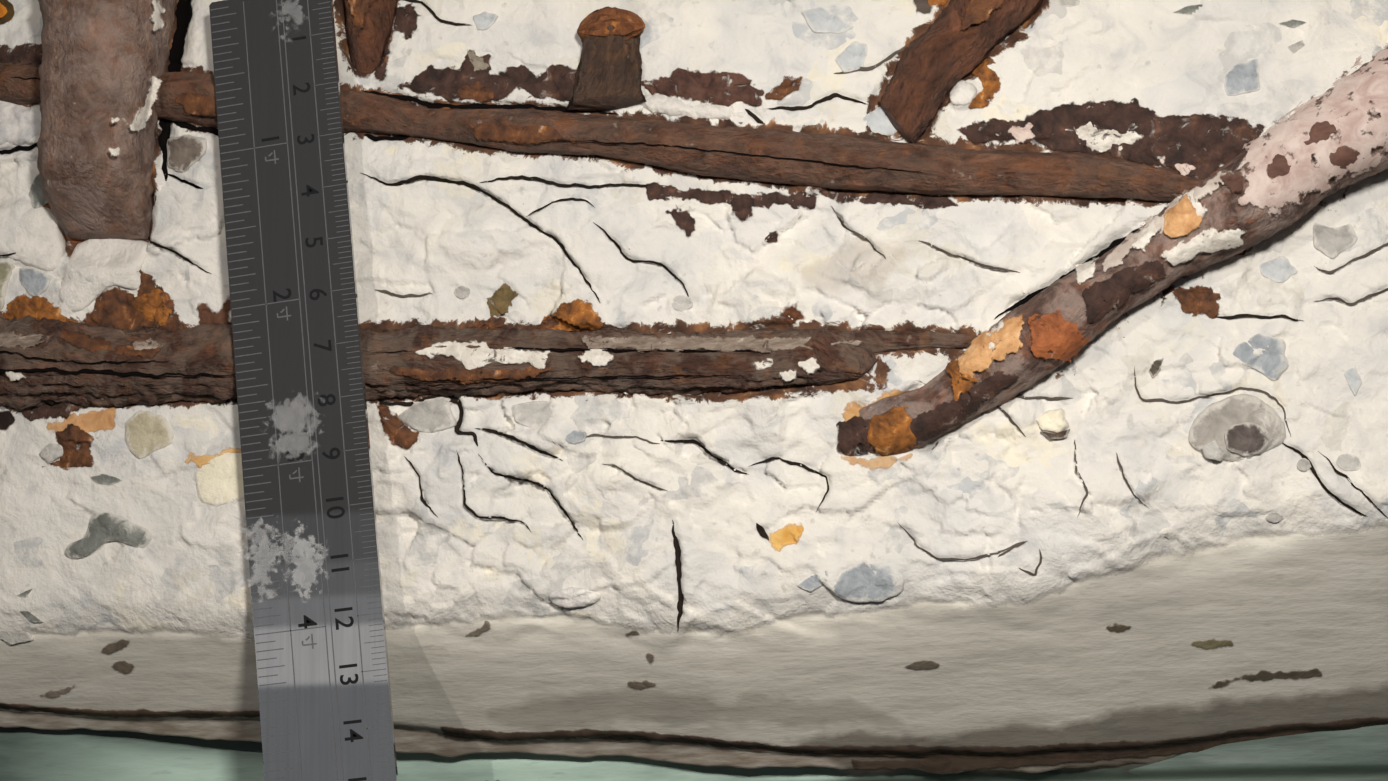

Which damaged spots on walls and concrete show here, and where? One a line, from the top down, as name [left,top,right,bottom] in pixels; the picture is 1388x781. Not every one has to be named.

corrosion [374,4,577,103]
crack [362,90,619,115]
corrosion [641,68,803,107]
spalling [333,0,1388,174]
corrosion [958,58,1265,192]
spalling [0,101,232,329]
crack [361,173,689,302]
corrosion [645,182,958,237]
spalling [0,399,254,674]
crack [380,395,829,632]
spalling [344,131,1388,636]
crack [1134,366,1388,518]